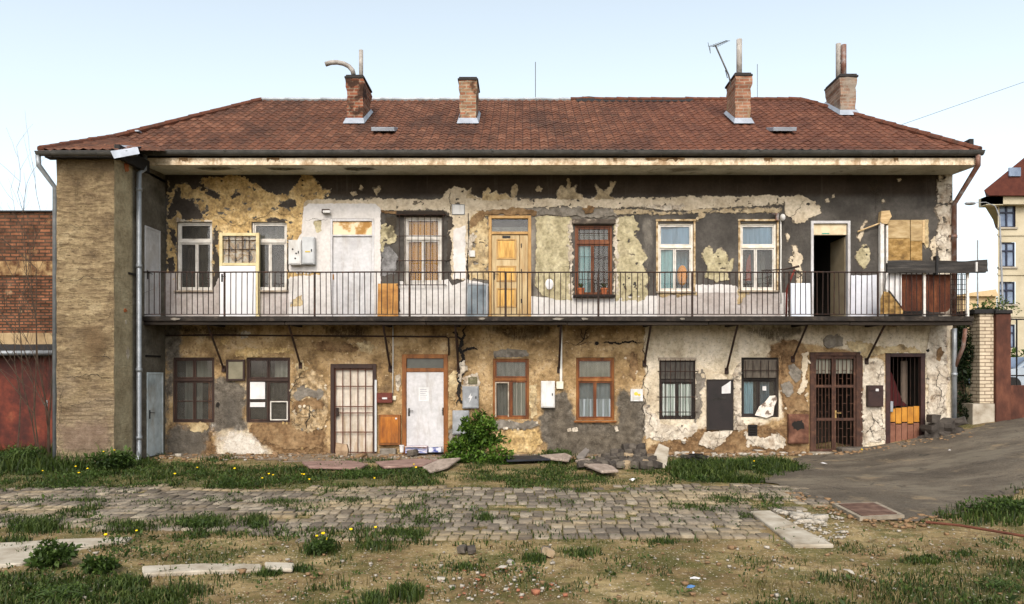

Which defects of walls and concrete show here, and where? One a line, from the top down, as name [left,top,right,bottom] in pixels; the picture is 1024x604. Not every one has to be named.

peeling [166,175,835,298]
spalling [923,175,952,261]
flaking render [220,330,329,451]
flaking render [643,362,806,454]
flaking render [779,339,811,414]